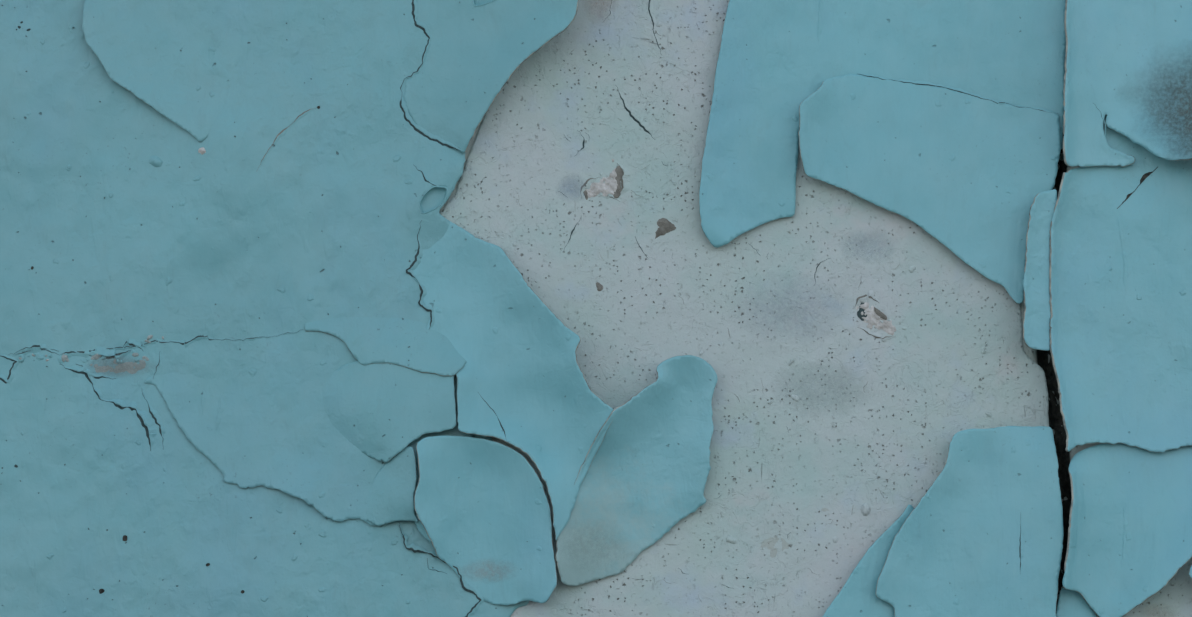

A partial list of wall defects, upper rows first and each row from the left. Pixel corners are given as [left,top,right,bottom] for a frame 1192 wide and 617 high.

peeling [82,0,223,142]
crack [400,0,464,152]
crack [413,164,438,186]
spalling [0,335,164,383]
crack [8,330,304,451]
crack [406,220,435,330]
peeling [144,222,718,586]
peeling [403,0,1192,617]
crack [1037,350,1072,610]